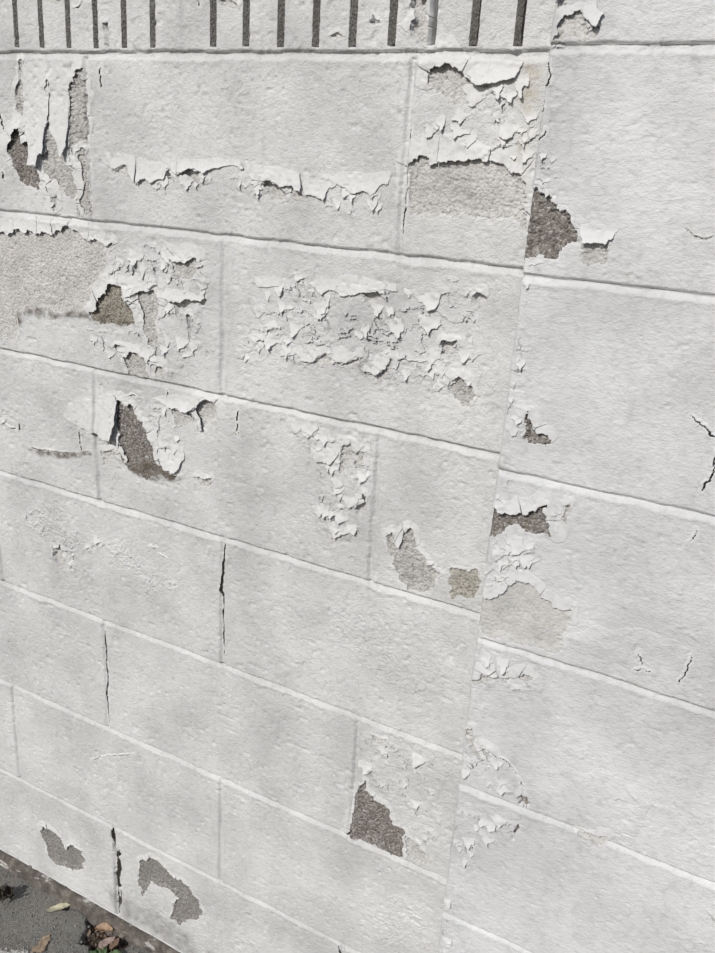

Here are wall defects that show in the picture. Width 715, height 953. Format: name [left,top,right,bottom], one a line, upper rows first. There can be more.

peeling [400,0,524,105]
peeling [550,0,604,44]
peeling [0,53,619,384]
peeling [429,319,481,406]
peeling [64,388,215,487]
crack [688,412,715,495]
peeling [490,483,576,544]
crack [682,525,700,550]
peeling [380,520,579,654]
peeling [35,820,87,871]
peeling [136,853,206,925]
peeling [341,775,433,865]